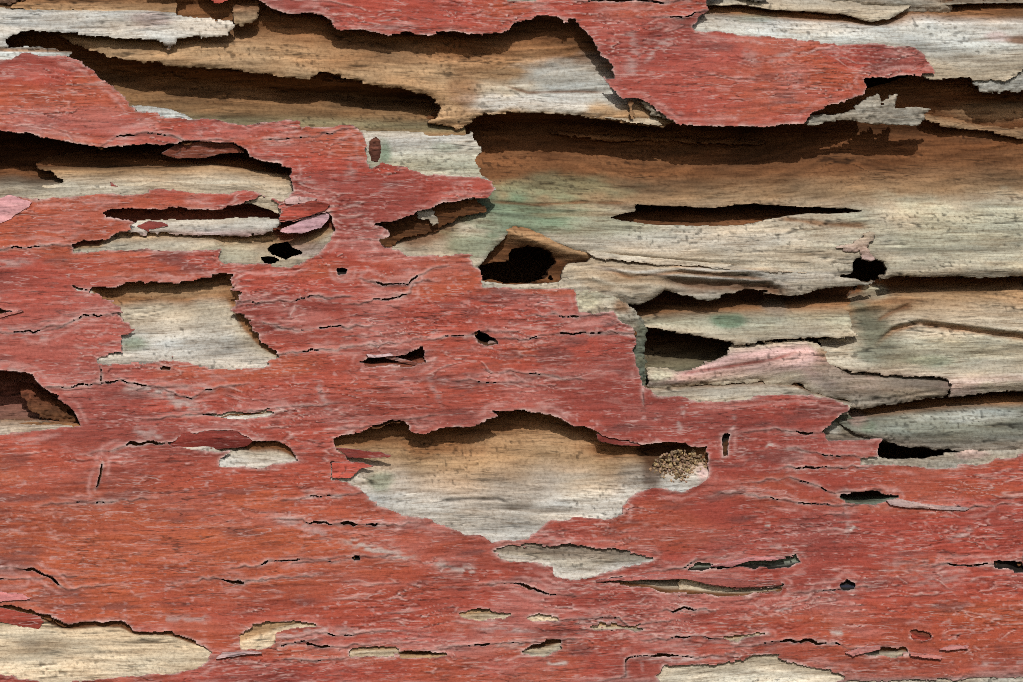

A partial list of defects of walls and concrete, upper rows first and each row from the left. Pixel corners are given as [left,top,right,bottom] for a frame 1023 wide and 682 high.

peeling [0,7,235,60]
peeling [360,130,496,190]
crack [373,275,418,301]
peeling [72,273,279,371]
peeling [158,430,298,468]
crack [306,495,377,527]
crack [0,568,59,586]
crack [513,583,556,596]
peeling [493,543,800,596]
peeling [0,591,316,682]
crack [625,606,713,663]
crack [764,638,840,646]